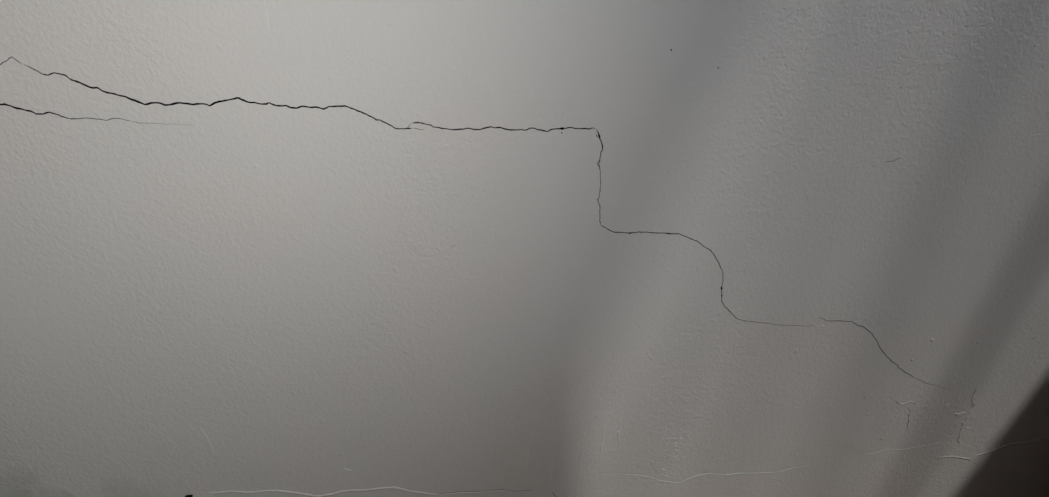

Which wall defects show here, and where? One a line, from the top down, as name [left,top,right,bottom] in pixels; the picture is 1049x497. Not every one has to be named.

crack [0,56,950,390]
crack [209,486,532,497]